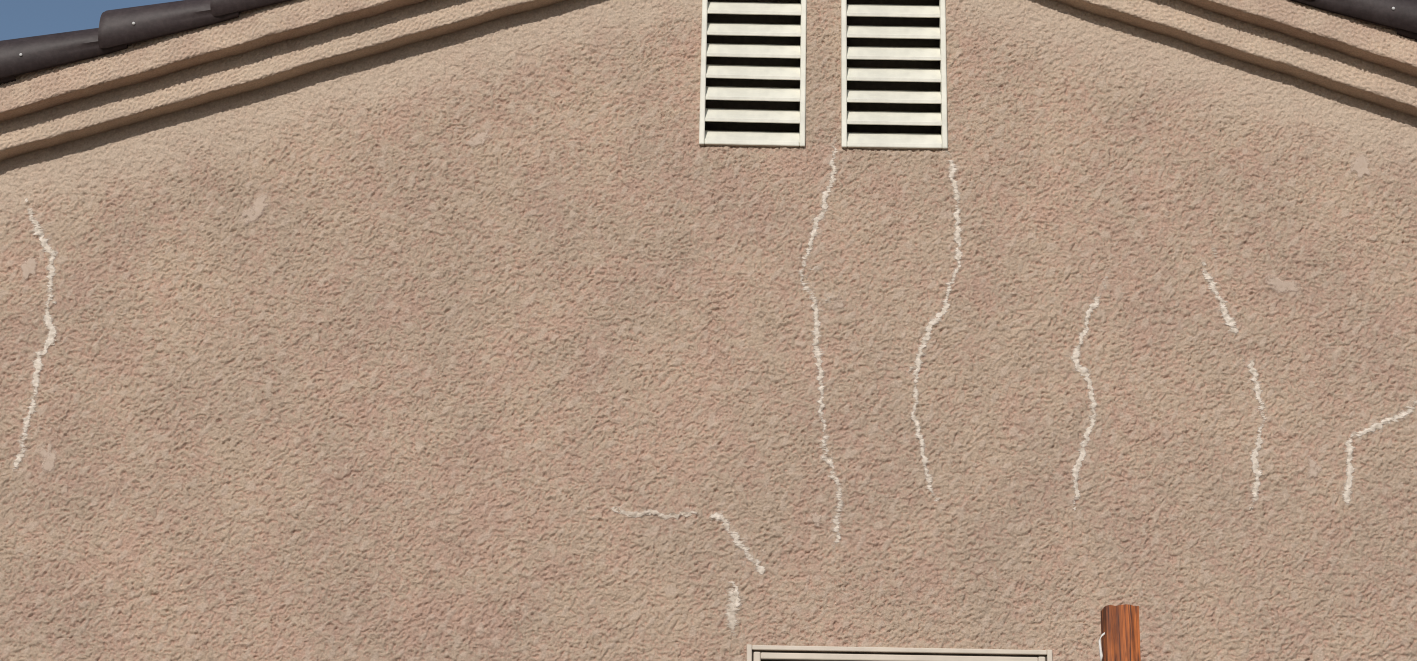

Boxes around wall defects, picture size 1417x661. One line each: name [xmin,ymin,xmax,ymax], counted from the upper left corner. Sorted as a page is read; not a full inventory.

crack [12,198,57,469]
crack [611,506,765,574]
crack [798,136,843,546]
crack [909,151,963,501]
crack [1071,271,1111,510]
crack [1202,248,1267,511]
crack [1342,400,1417,505]